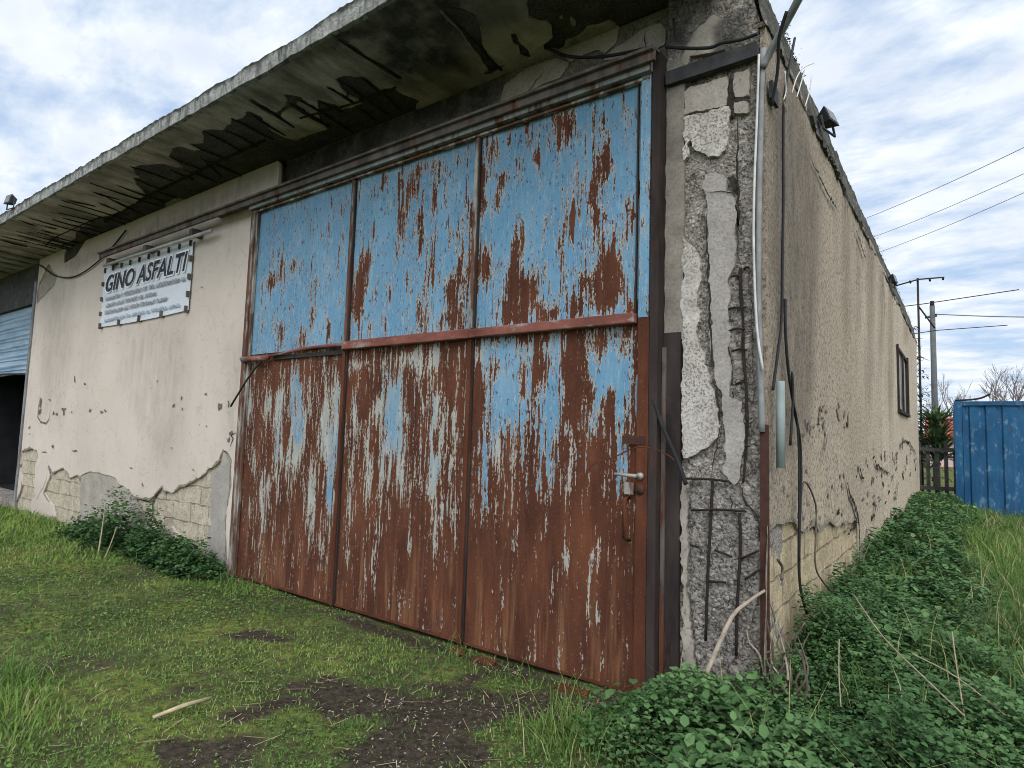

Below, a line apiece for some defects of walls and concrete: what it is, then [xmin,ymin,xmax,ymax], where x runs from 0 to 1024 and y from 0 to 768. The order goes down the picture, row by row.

spalling [2,40,419,263]
peeling [682,69,751,162]
flaking render [16,431,233,573]
spalling [680,172,916,682]